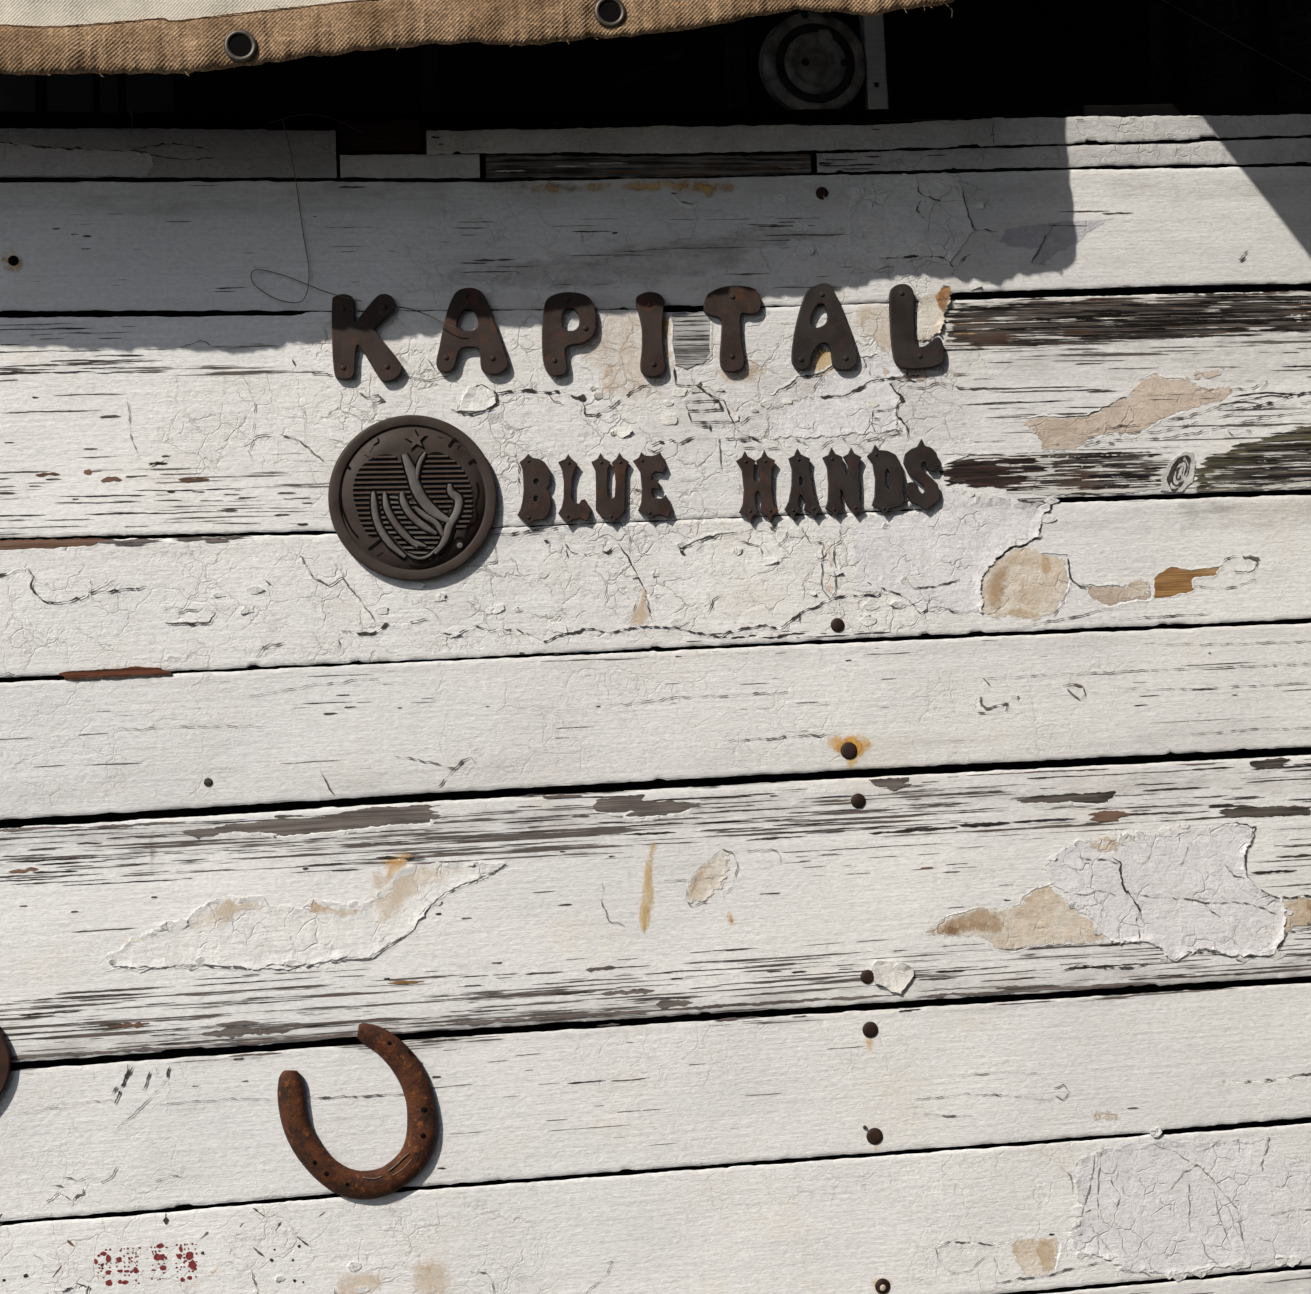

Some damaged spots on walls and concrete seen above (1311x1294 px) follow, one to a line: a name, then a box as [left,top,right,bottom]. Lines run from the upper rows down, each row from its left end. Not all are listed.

peeling [0,143,153,177]
crack [886,177,997,274]
peeling [661,282,1311,657]
crack [0,568,145,609]
crack [299,524,959,647]
crack [165,609,215,626]
crack [124,678,379,730]
crack [624,691,787,705]
crack [728,733,834,741]
corrosion [831,737,870,765]
peeling [0,757,1311,1061]
peeling [1011,1128,1311,1294]